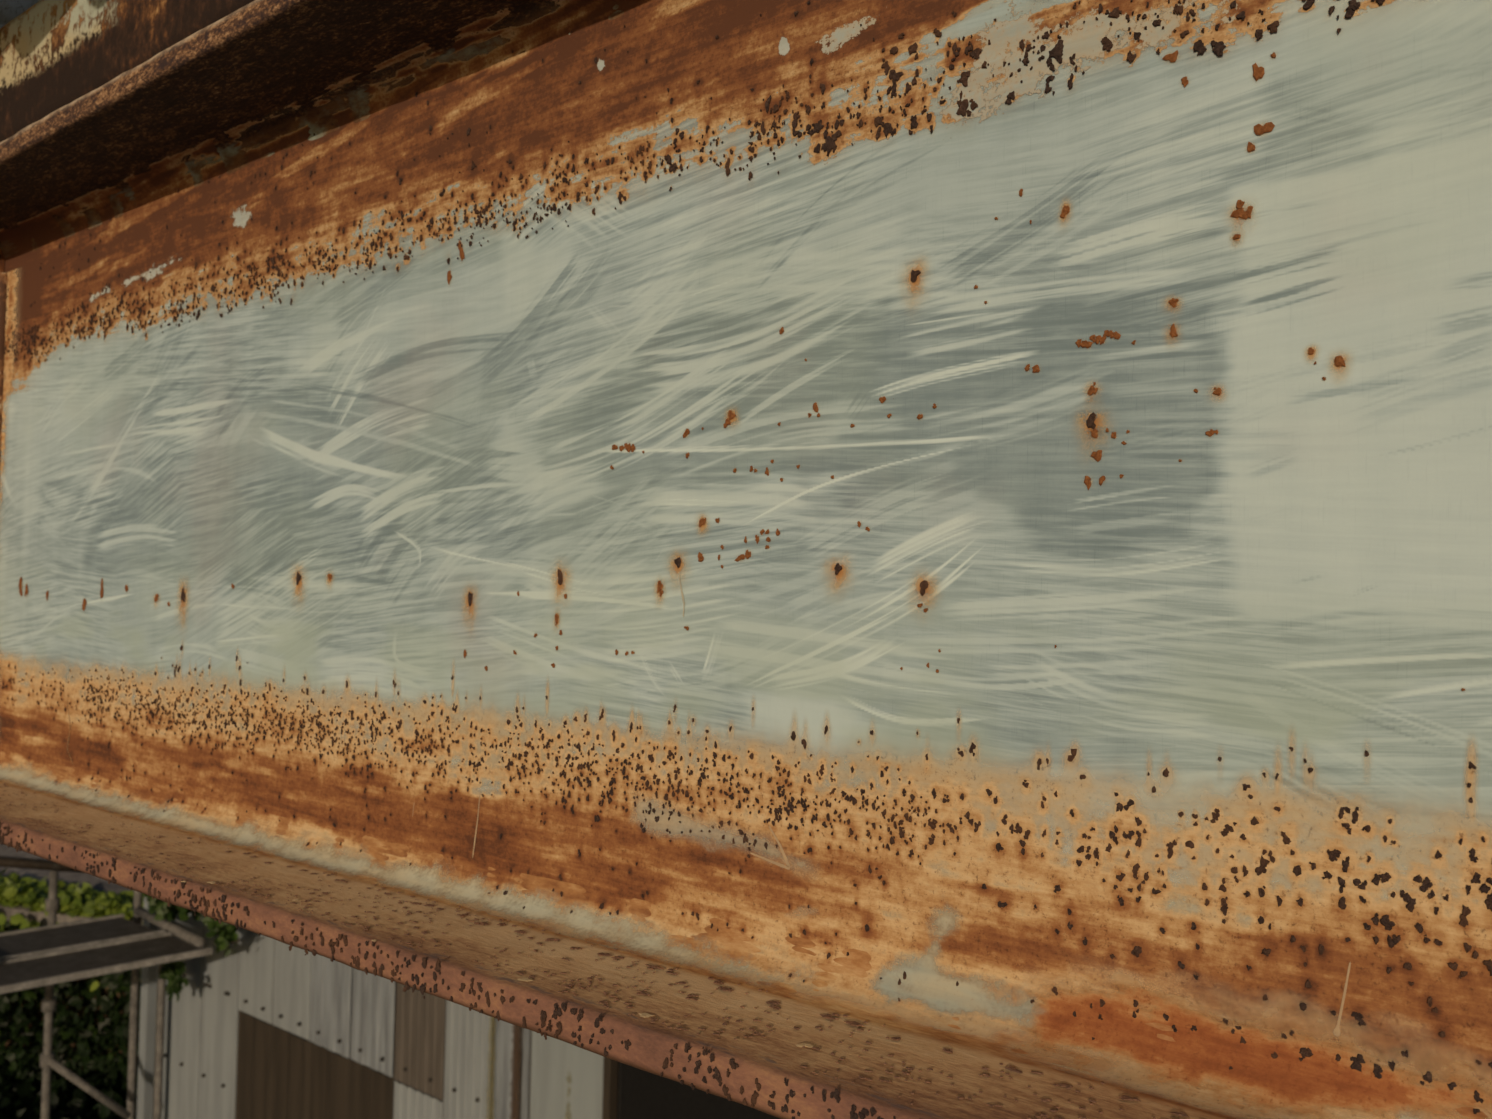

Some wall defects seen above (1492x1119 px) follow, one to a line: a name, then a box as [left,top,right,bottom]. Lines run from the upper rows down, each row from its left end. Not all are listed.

peeling [939,0,1241,125]
rust [0,0,1395,502]
rust [154,586,187,614]
rust [294,571,302,594]
rust [465,591,474,614]
rust [551,569,567,668]
rust [656,528,780,630]
rust [831,563,846,586]
rust [916,578,933,612]
rust [0,645,1492,1119]